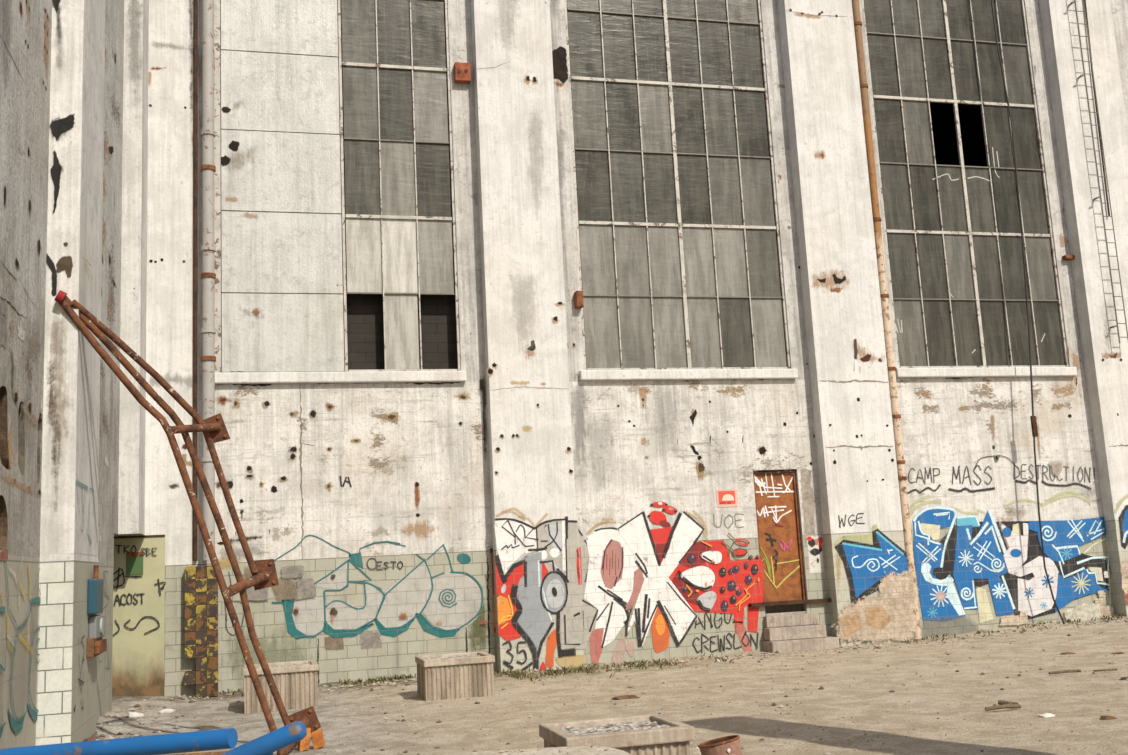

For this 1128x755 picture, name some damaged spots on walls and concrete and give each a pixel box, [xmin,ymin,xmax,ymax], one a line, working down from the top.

crack [0,264,37,319]
rust [854,339,882,369]
peeling [900,379,943,413]
peeling [959,378,1077,433]
peeling [831,568,919,646]